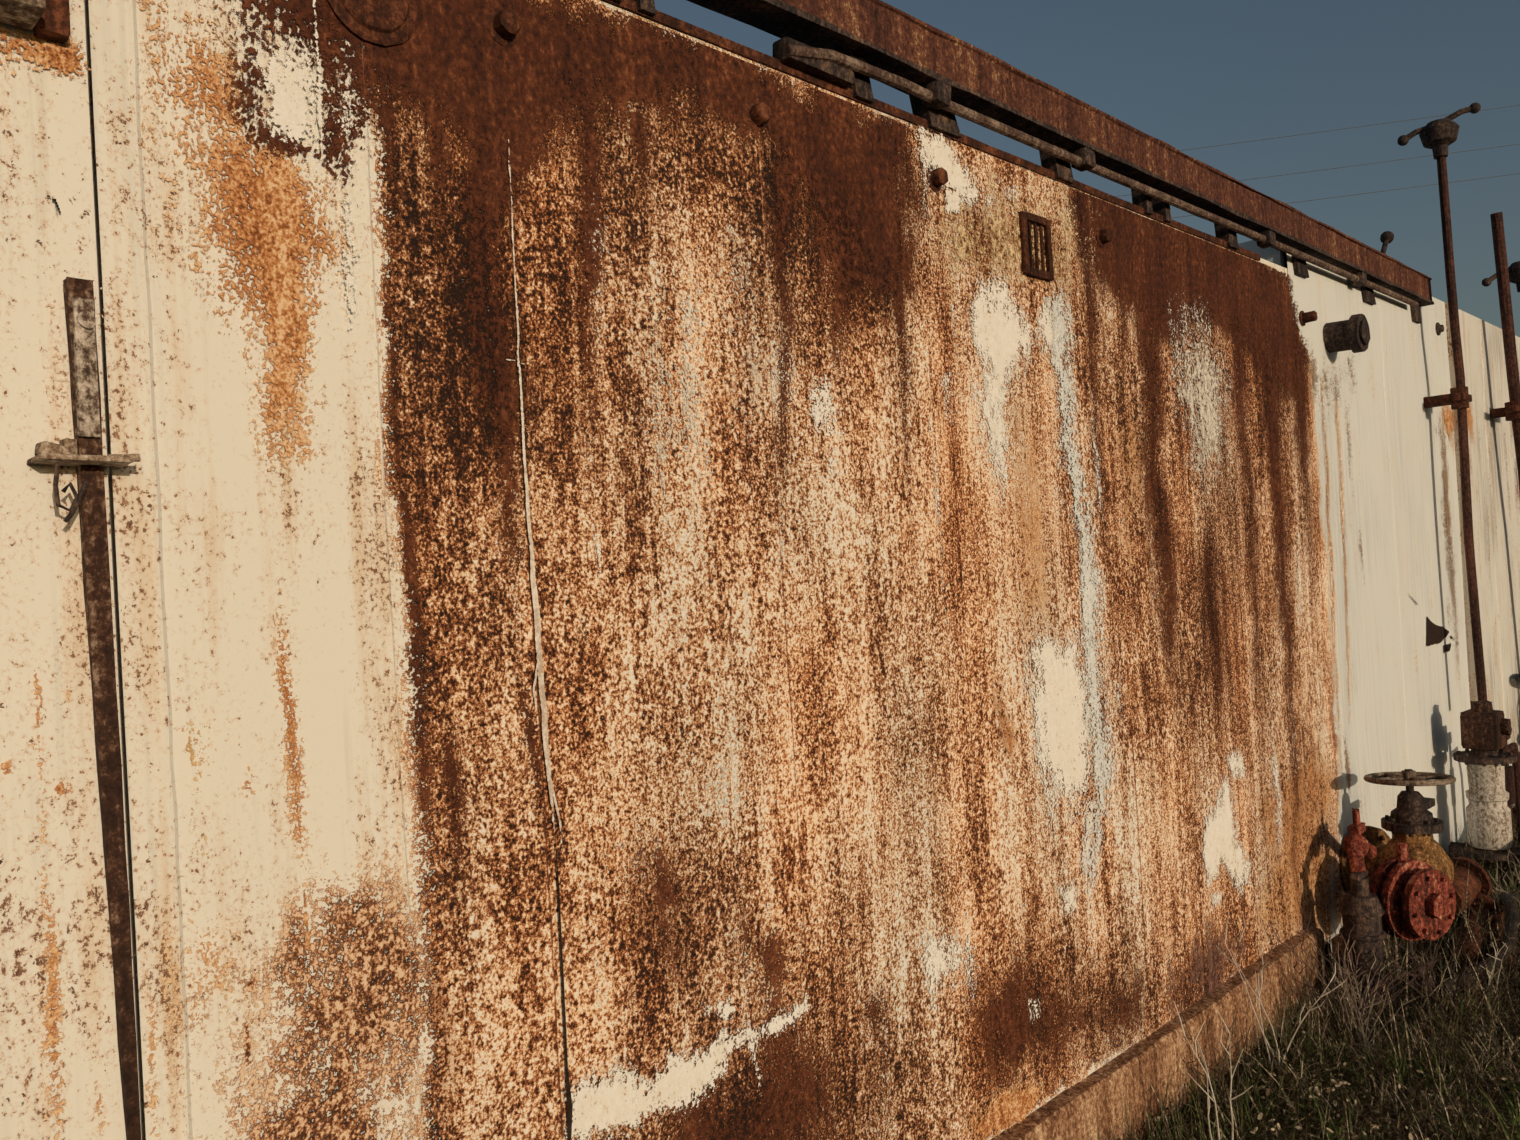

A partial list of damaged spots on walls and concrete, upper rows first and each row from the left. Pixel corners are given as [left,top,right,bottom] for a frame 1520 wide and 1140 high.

spalling [1409,595,1455,653]
rust [171,719,242,855]
rust [270,605,312,867]